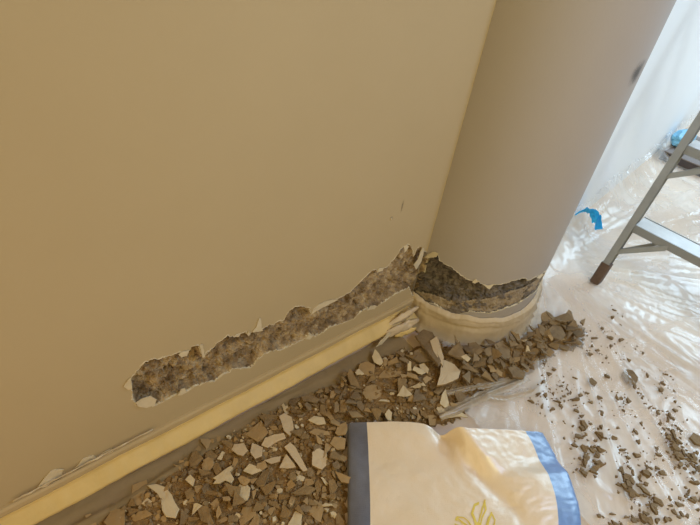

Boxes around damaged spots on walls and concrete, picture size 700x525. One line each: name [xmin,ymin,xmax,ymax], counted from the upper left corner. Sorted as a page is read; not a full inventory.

flaking render [124,244,548,408]